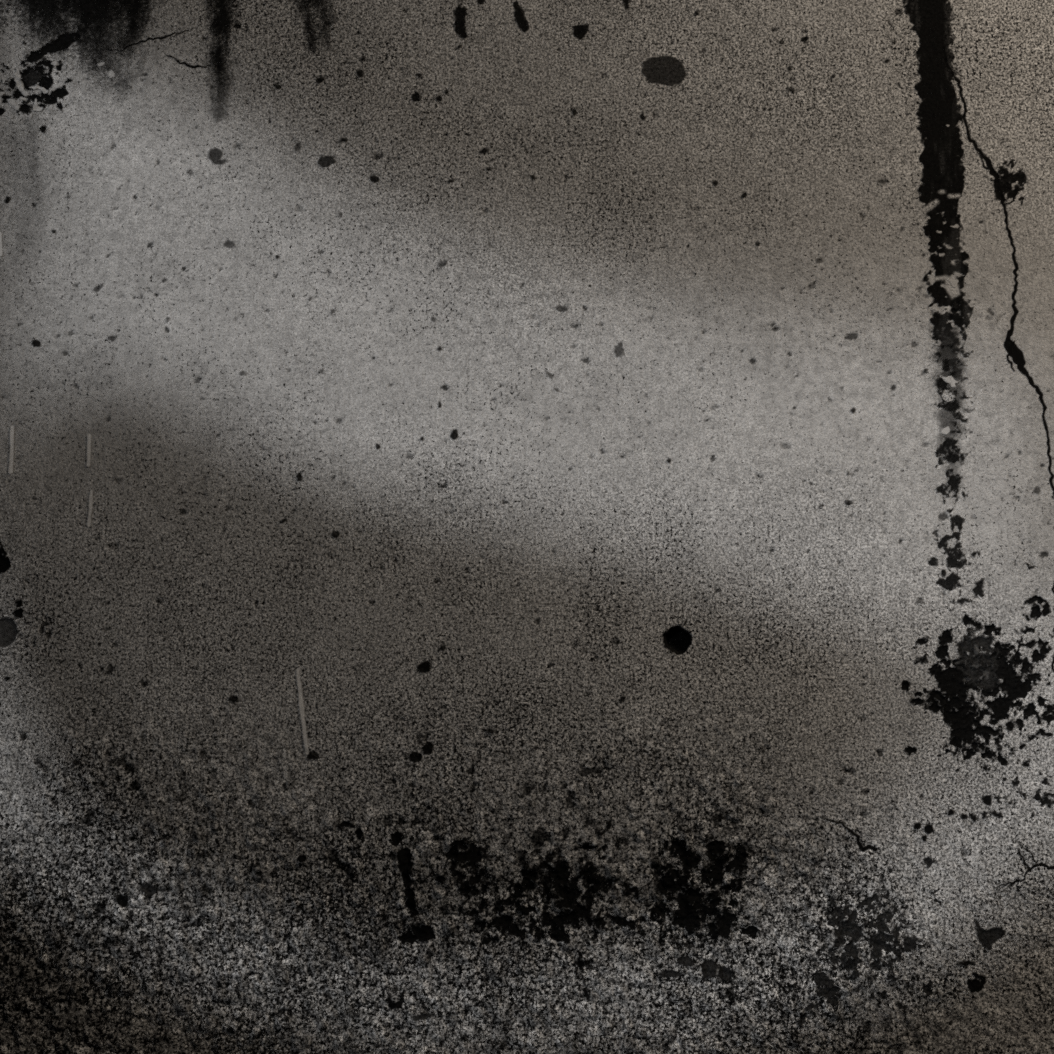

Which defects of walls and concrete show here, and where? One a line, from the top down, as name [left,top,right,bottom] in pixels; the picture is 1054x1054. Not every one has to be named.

spalling [0,32,80,118]
leakage [0,0,150,86]
leakage [207,0,237,117]
leakage [298,0,335,50]
leakage [904,0,984,604]
crack [943,47,1054,495]
spalling [0,541,11,573]
spalling [12,600,24,618]
spalling [901,595,1054,822]
spalling [914,822,933,841]
crack [997,842,1054,887]
spalling [391,821,760,1001]